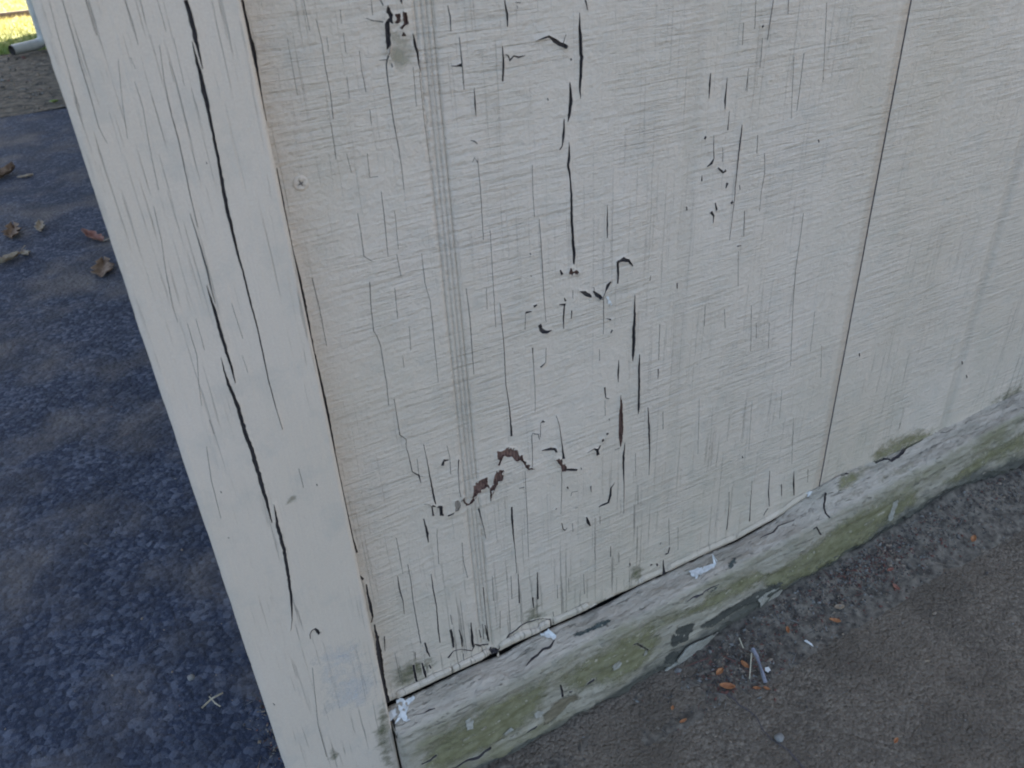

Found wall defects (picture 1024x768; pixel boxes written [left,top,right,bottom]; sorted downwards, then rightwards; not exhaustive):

crack [560,0,588,264]
crack [707,0,789,264]
crack [49,0,293,627]
crack [599,297,660,481]
crack [276,158,611,731]
peeling [423,444,536,517]
peeling [542,416,582,510]
damp [807,474,997,576]
peeling [664,631,718,671]
damp [665,582,783,664]
peeling [758,588,783,608]
damp [543,695,578,725]